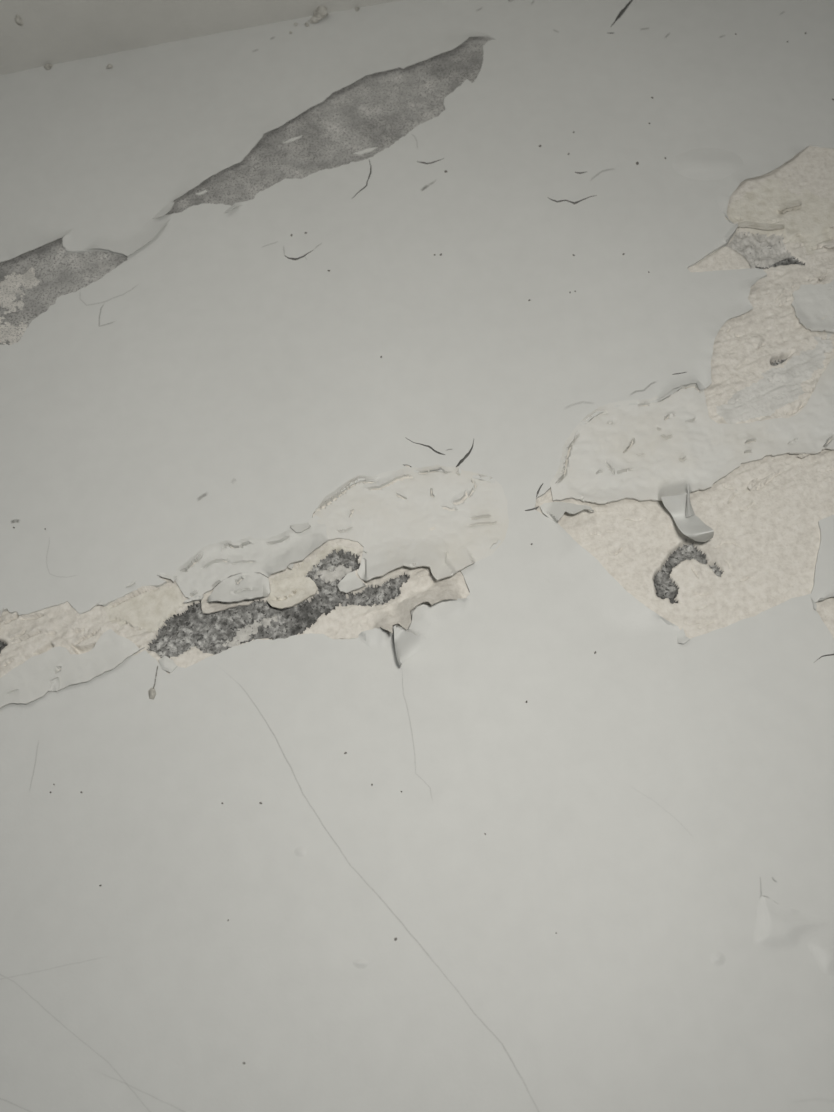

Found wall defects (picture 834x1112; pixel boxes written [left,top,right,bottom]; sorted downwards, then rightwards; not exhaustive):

peeling [0,22,496,345]
flaking render [532,144,834,644]
flaking render [0,465,509,708]